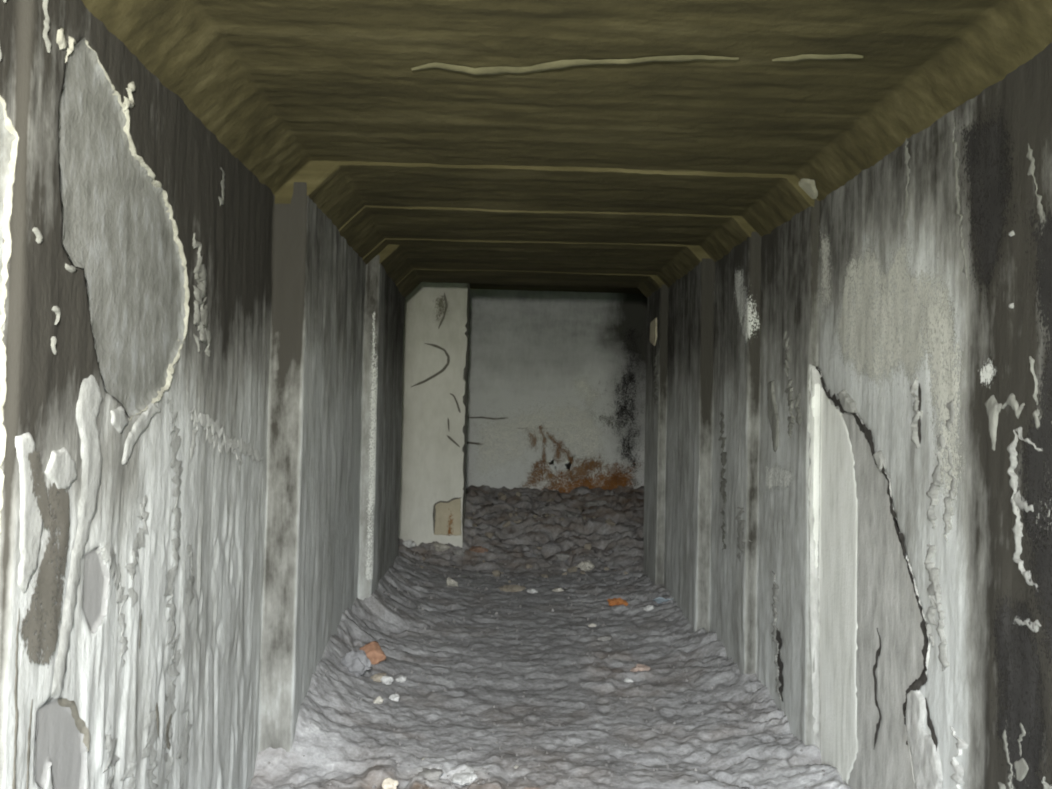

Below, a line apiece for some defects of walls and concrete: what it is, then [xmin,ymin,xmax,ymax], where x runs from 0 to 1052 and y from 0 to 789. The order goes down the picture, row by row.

flaking render [0,0,212,789]
leakage [466,322,646,488]
corrosion [519,425,642,494]
leakage [952,97,1052,789]
peeling [980,356,1052,592]
peeling [1012,616,1041,632]
peeling [998,717,1030,789]